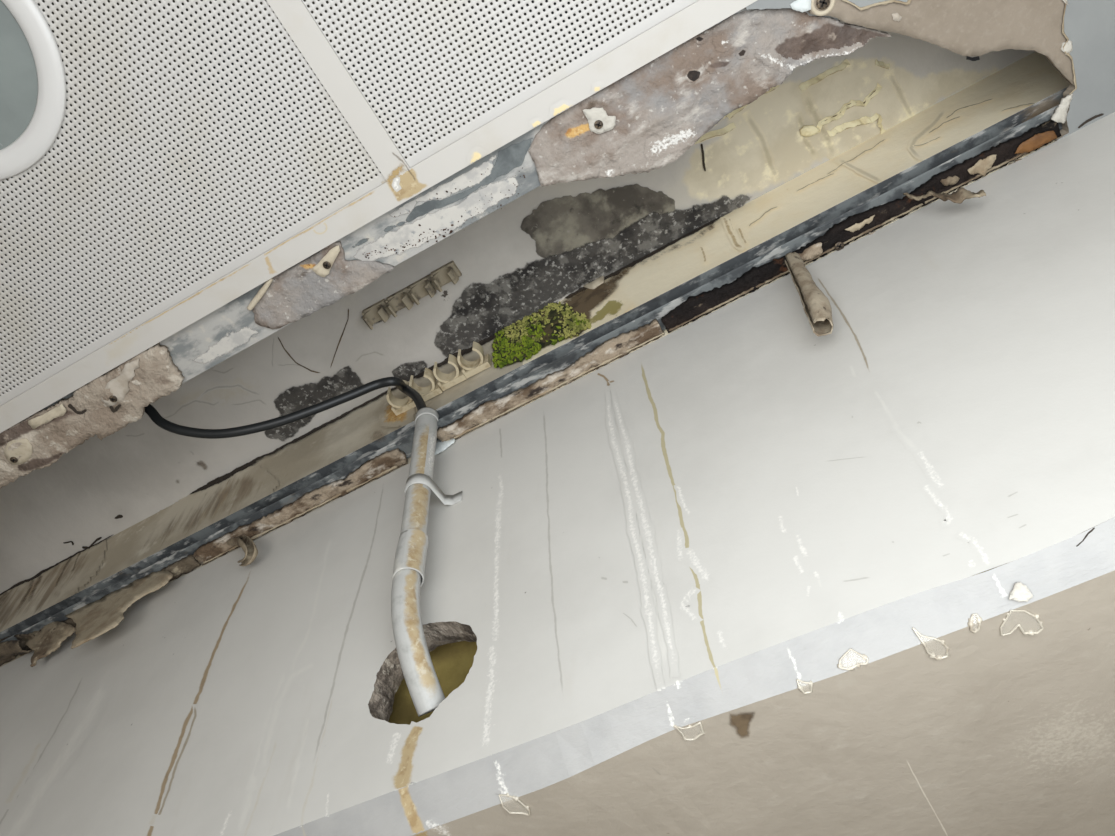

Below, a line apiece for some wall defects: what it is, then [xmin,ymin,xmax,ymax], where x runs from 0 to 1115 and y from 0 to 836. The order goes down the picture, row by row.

damp [644,121,704,161]
peeling [673,0,1077,209]
damp [433,161,750,357]
peeling [583,276,605,289]
peeling [435,438,455,455]
rust [374,395,445,708]
damp [605,356,732,731]
peeling [1009,582,1033,602]
hole [368,648,433,725]
hole [423,621,477,698]
rust [382,721,459,836]